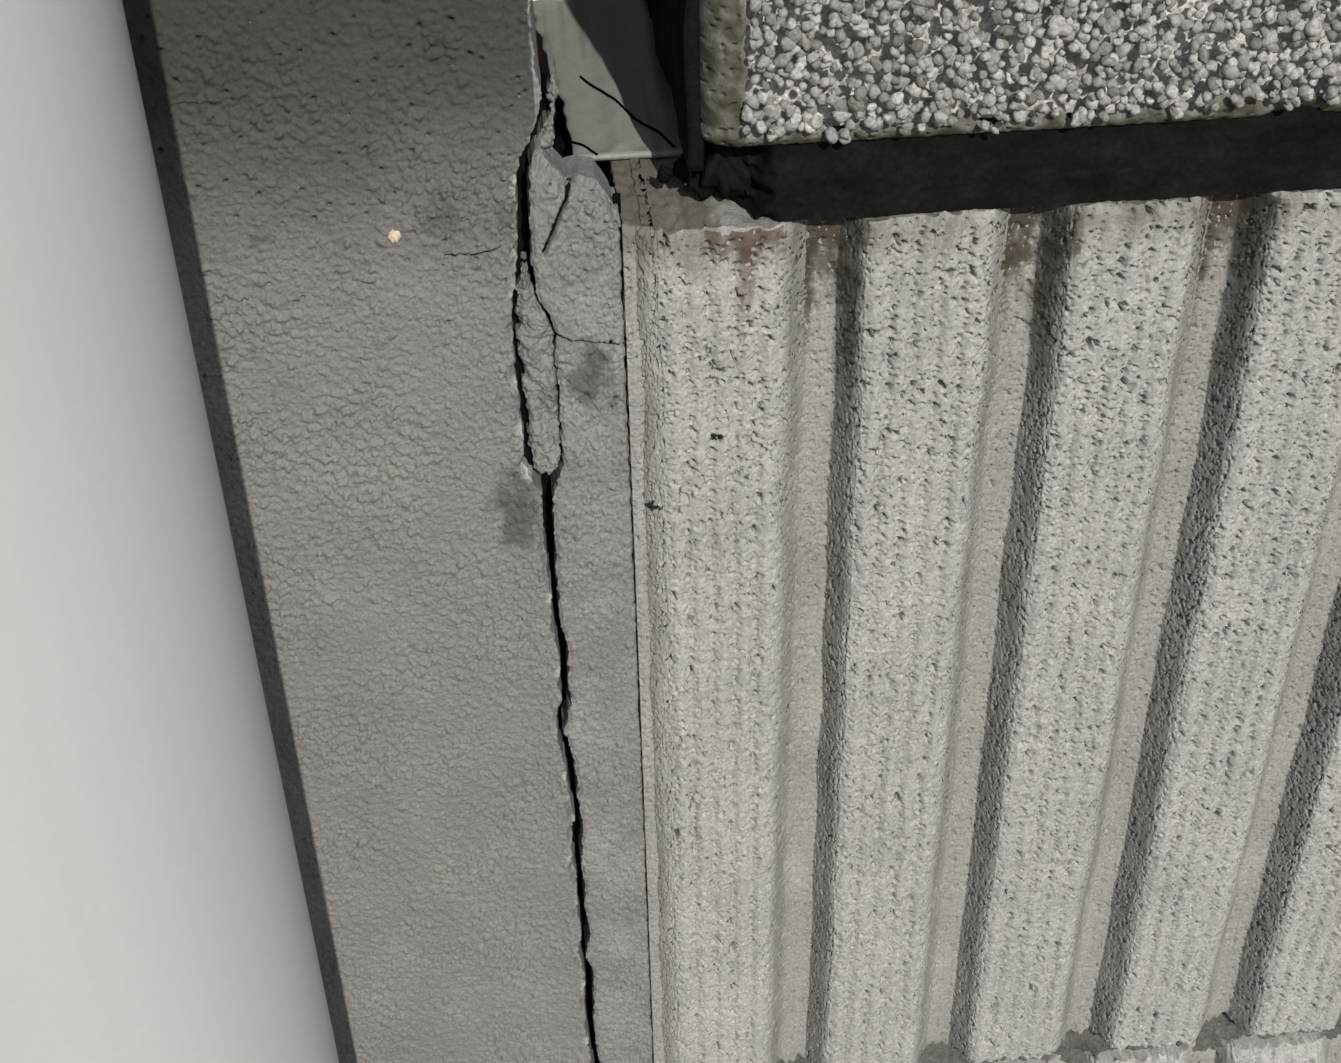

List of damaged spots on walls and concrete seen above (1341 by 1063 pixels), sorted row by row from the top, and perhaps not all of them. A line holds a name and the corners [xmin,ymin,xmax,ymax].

crack [444,62,627,1063]